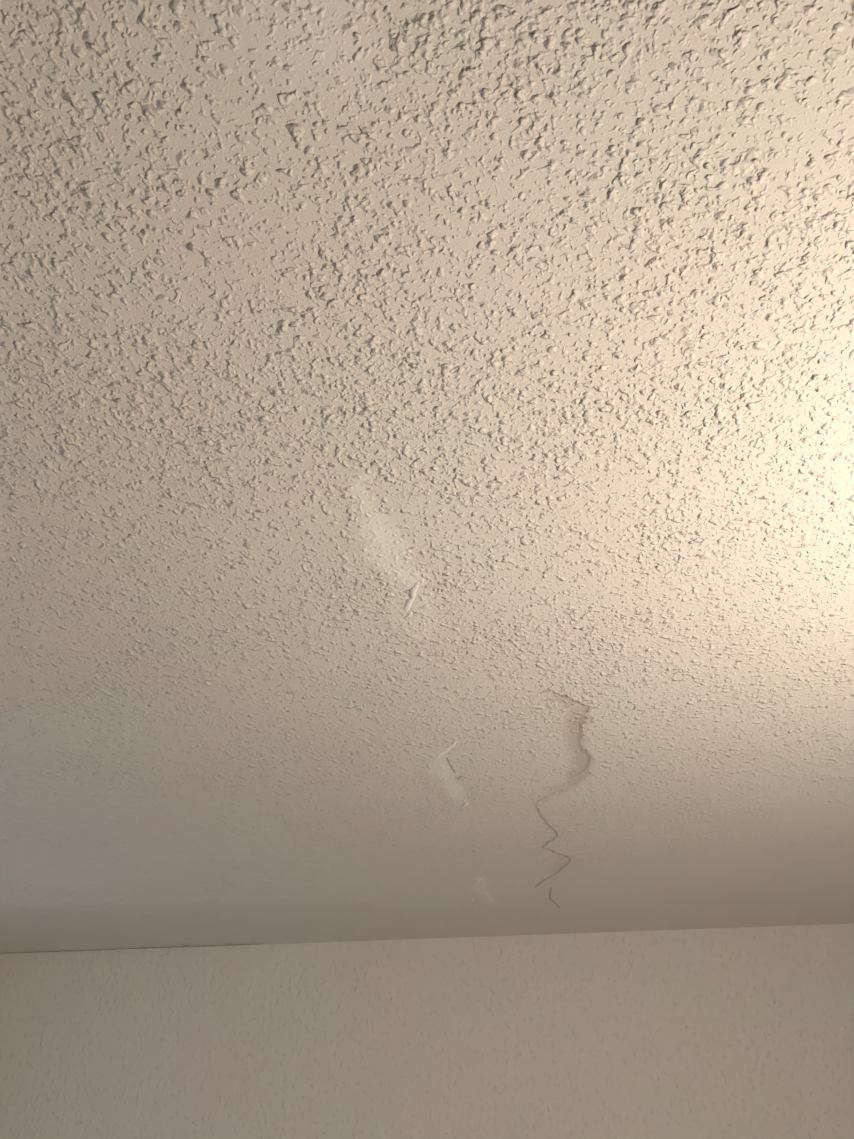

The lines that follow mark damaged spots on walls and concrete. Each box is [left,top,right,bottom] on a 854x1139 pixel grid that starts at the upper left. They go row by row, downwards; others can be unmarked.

crack [533,690,600,909]